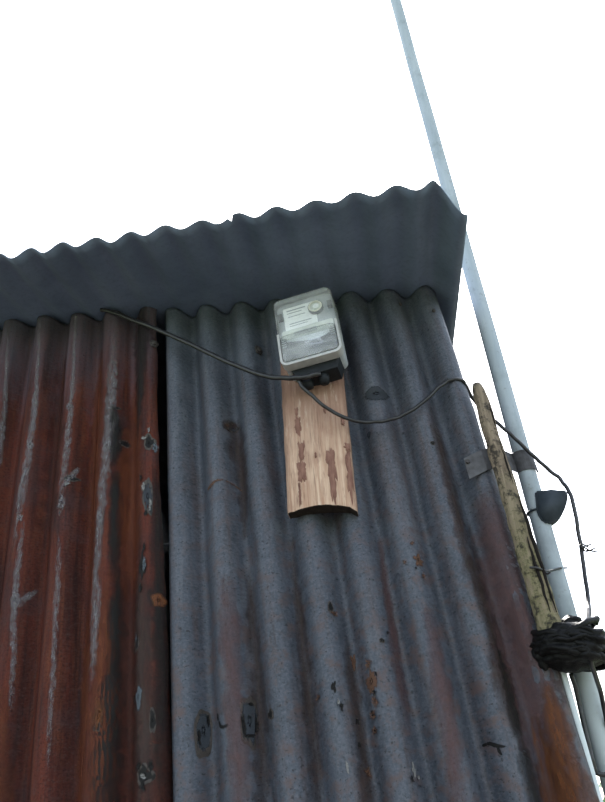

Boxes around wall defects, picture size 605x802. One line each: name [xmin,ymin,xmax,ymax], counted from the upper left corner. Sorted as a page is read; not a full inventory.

corrosion [90,373,101,557]
peeling [139,475,153,516]
corrosion [88,593,167,802]
peeling [134,685,142,710]
corrosion [347,654,379,802]